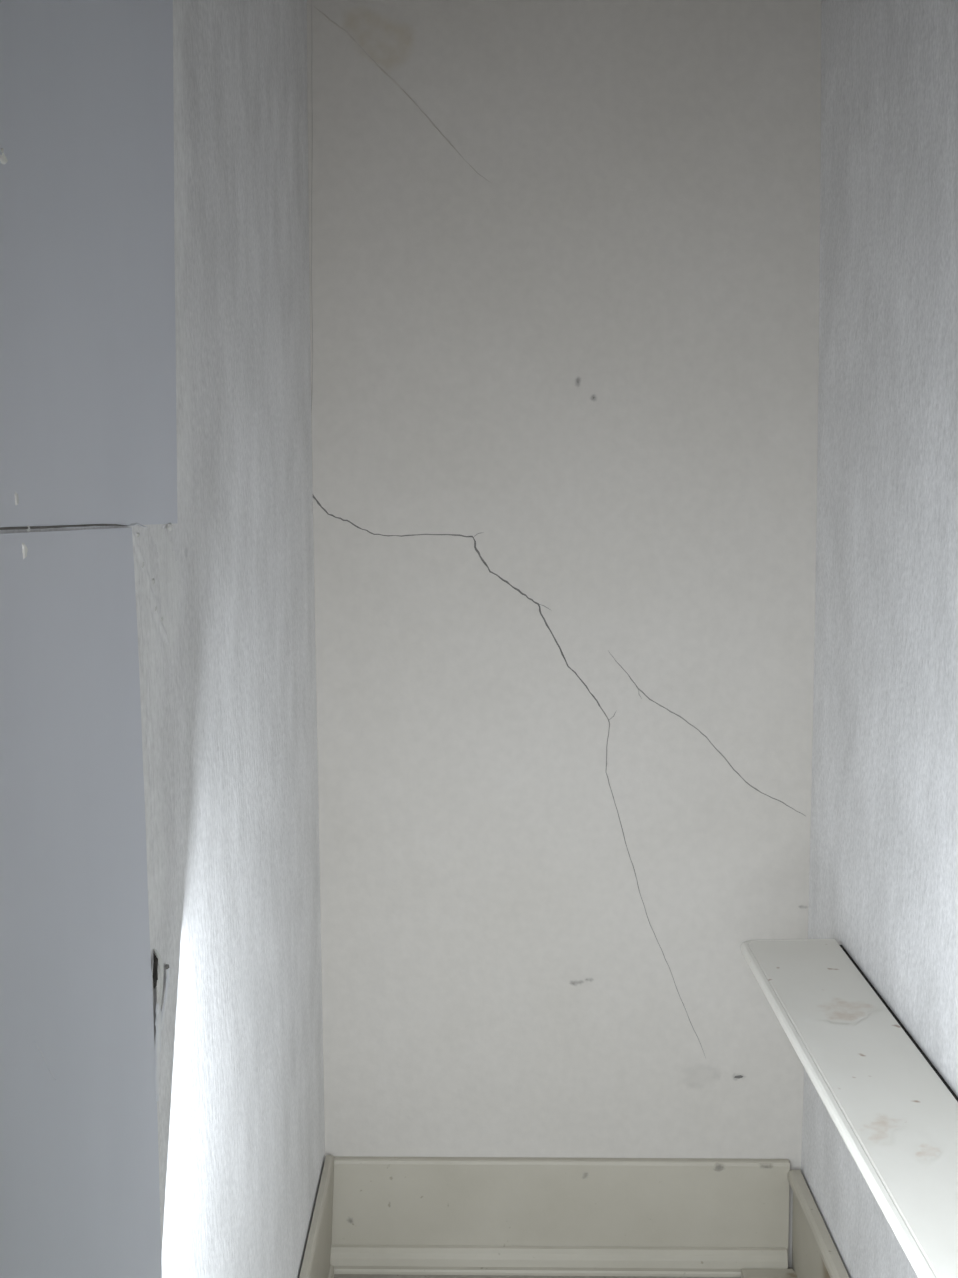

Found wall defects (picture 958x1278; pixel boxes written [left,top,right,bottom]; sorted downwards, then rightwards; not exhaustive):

crack [312,470,805,1058]